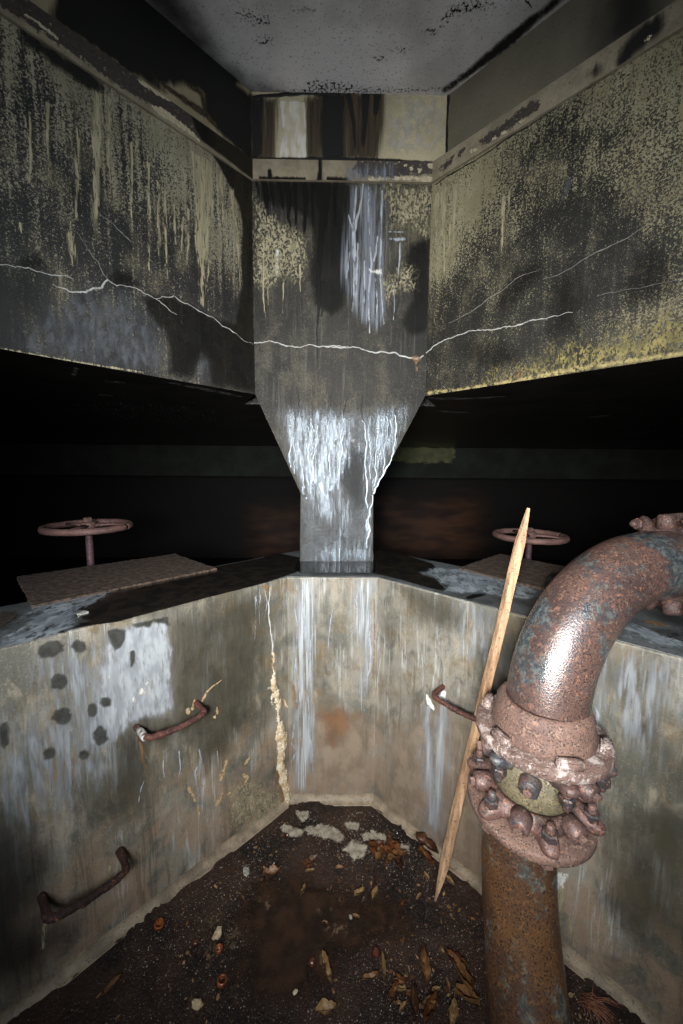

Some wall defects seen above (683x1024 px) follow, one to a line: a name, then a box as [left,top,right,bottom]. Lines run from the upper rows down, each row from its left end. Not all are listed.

water stain [20,28,112,221]
water stain [52,0,559,397]
crack [0,216,664,360]
water stain [428,352,683,413]
water stain [530,100,589,146]
water stain [288,391,535,706]
water stain [0,553,366,811]
crack [267,587,291,803]
water stain [384,691,468,860]